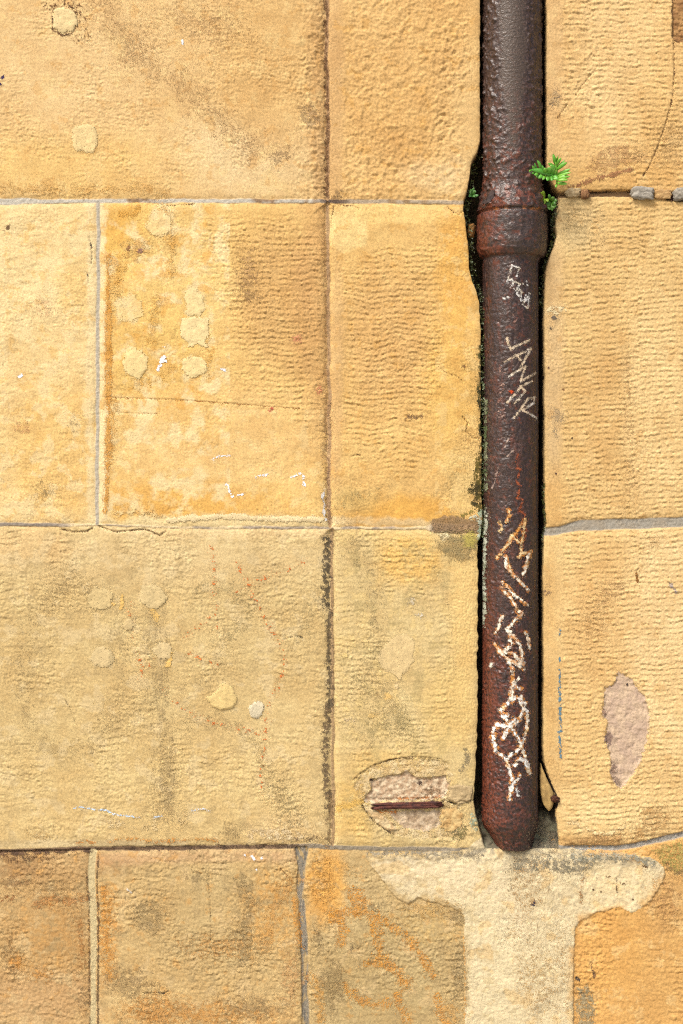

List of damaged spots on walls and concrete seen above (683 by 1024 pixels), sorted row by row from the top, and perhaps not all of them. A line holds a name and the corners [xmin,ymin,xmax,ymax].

crack [589,43,675,193]
spalling [599,671,653,789]
spalling [354,755,473,843]